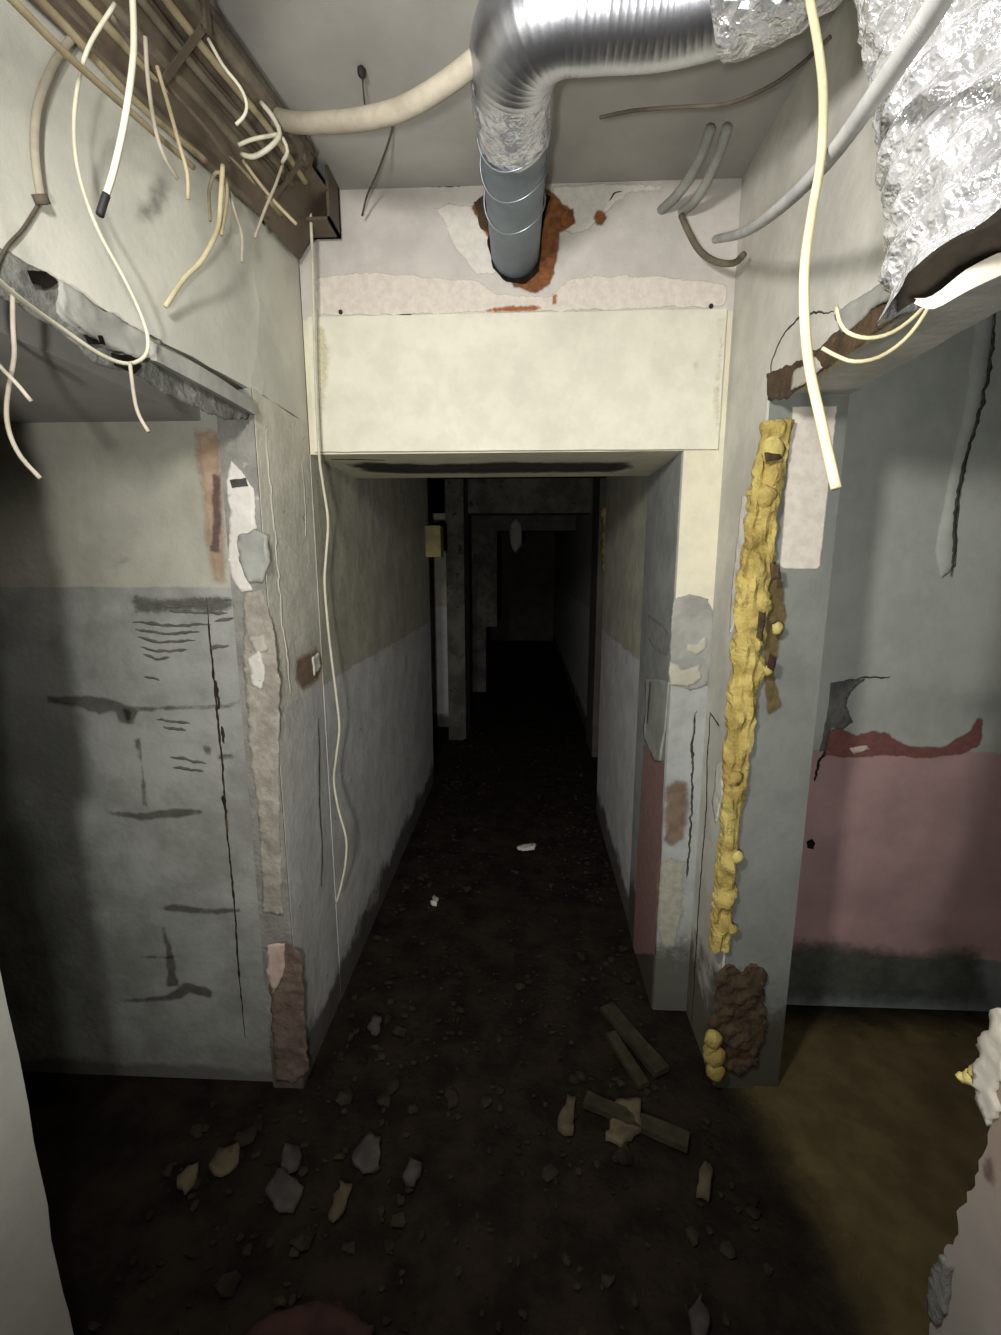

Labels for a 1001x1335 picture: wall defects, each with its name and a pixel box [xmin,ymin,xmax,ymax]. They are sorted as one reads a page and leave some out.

peeling [315,204,727,316]
rust [472,190,575,312]
rust [594,210,606,225]
peeling [553,183,661,234]
spalling [0,248,257,420]
spalling [729,495,748,633]
crack [206,597,246,1038]
peeling [633,594,713,955]
spalling [712,762,724,822]
peeling [814,676,983,781]
spalling [266,941,309,1083]